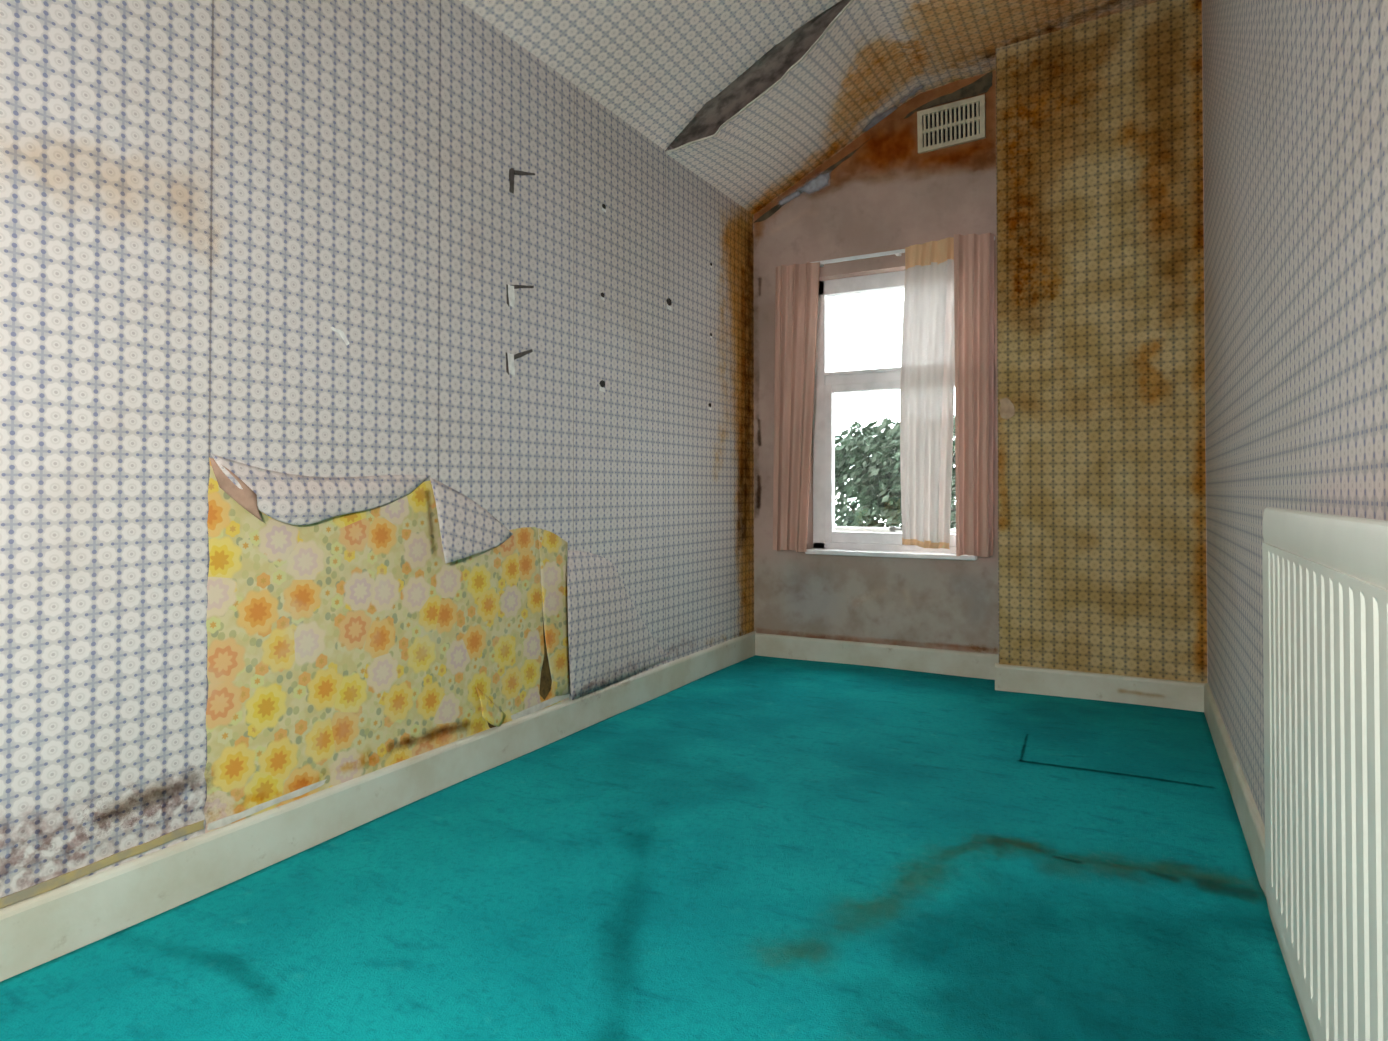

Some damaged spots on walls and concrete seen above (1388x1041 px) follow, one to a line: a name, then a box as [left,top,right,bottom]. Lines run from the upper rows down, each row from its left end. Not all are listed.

crack [669,0,851,148]